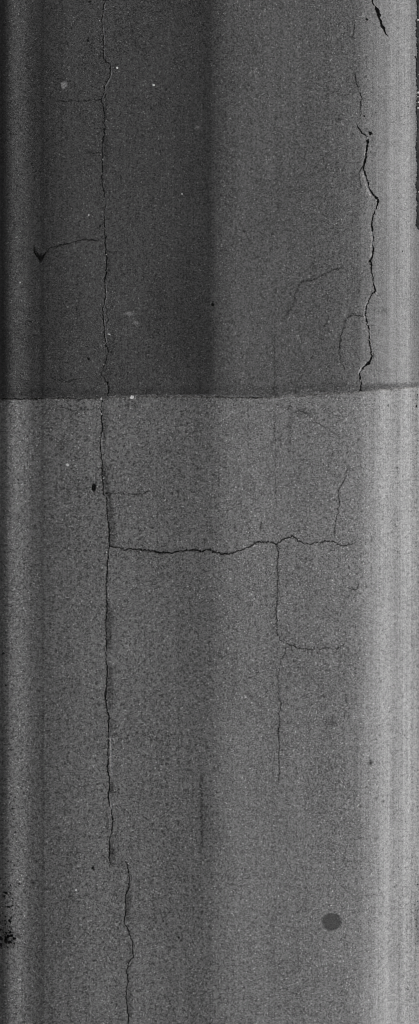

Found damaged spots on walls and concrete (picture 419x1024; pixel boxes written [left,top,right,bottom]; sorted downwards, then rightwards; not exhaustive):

crack [352,0,388,36]
crack [273,74,379,502]
crack [33,0,353,1024]